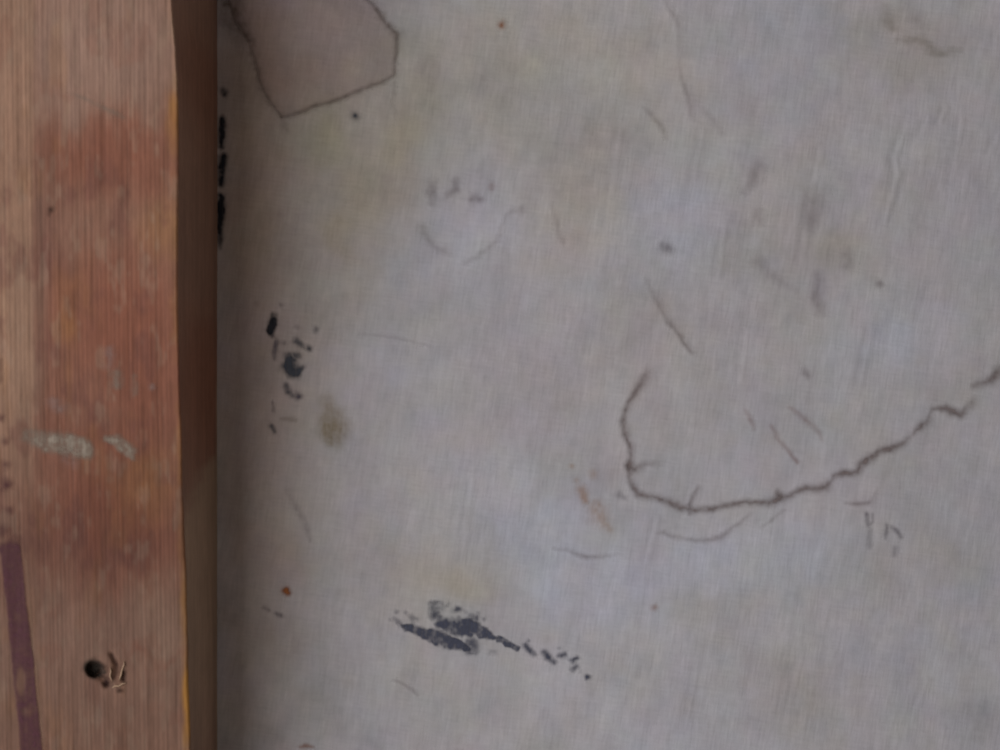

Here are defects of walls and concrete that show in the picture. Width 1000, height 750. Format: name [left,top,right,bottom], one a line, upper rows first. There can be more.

crack [622,384,962,512]